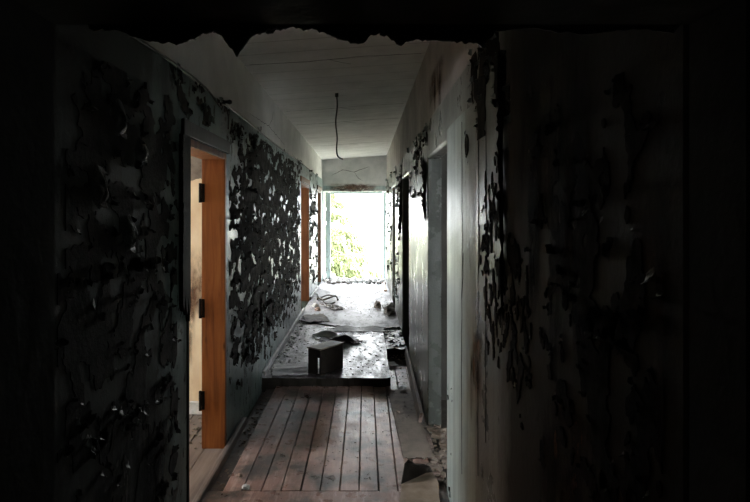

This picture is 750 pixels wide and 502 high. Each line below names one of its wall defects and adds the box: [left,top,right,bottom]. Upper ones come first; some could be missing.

peeling [169,63,335,370]
peeling [348,123,428,300]
peeling [480,156,532,404]